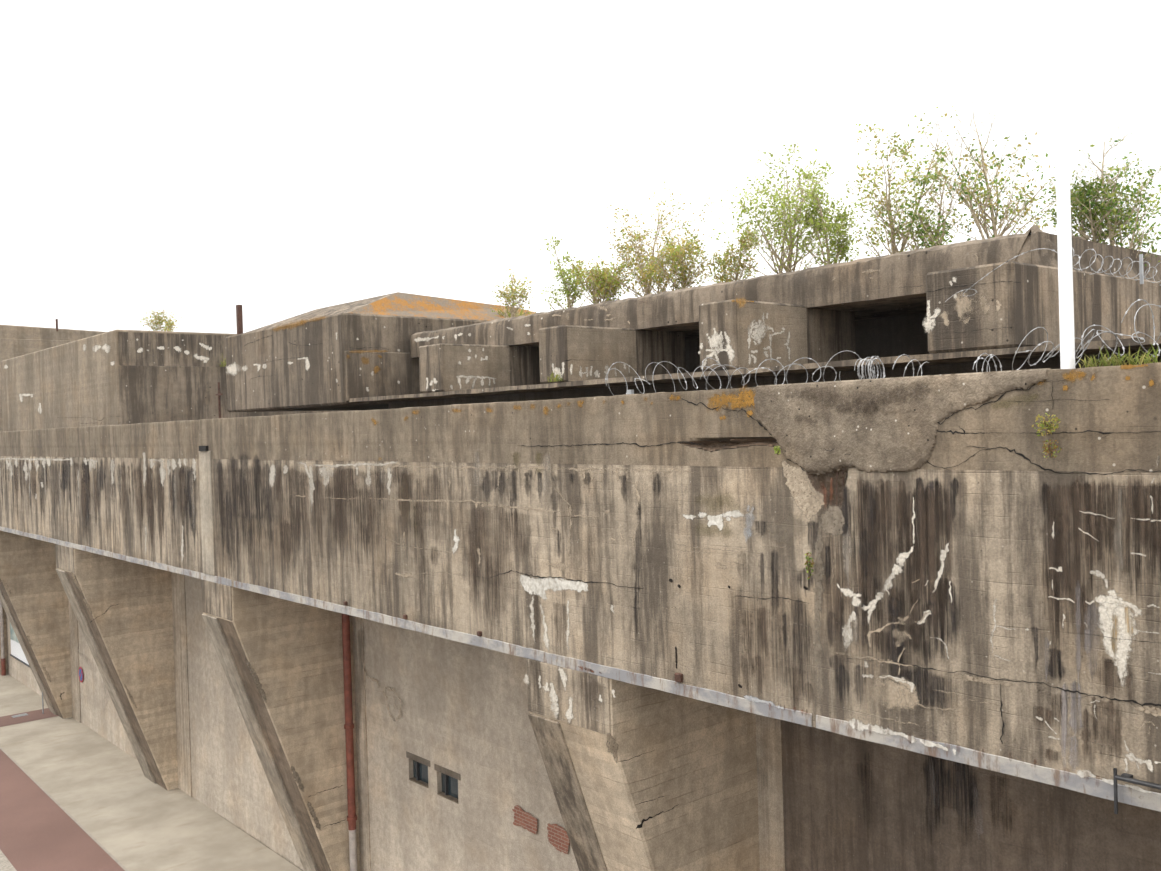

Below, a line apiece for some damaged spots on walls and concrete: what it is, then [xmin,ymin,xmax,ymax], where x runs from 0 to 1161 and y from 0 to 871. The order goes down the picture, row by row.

leakage [0,453,198,560]
leakage [217,453,610,650]
efflorescence [524,667,573,723]
crack [472,570,643,589]
leakage [569,467,644,627]
leakage [683,510,744,531]
crack [683,399,805,471]
leakage [728,546,811,697]
spalling [782,460,848,679]
leakage [800,478,960,725]
crack [927,378,1161,475]
leakage [990,478,1161,772]